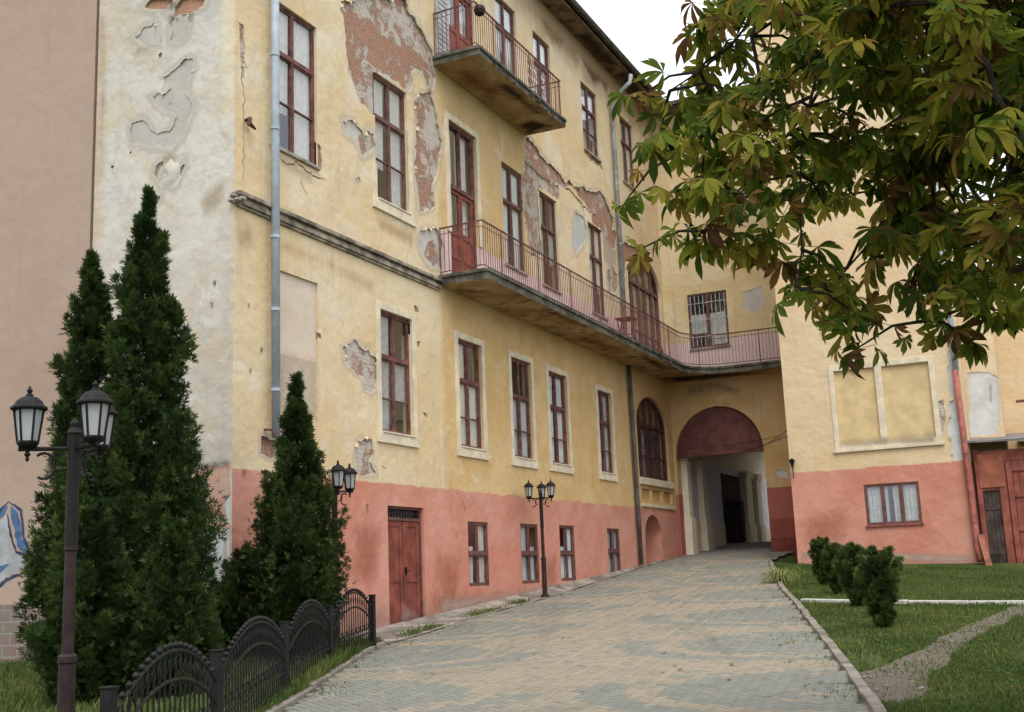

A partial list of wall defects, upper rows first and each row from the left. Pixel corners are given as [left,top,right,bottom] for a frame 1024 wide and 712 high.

peeling [128,0,209,206]
peeling [340,0,444,270]
peeling [516,135,640,297]
flaking render [259,433,277,461]
peeling [341,338,377,395]
peeling [353,435,378,478]
peeling [938,346,1000,460]